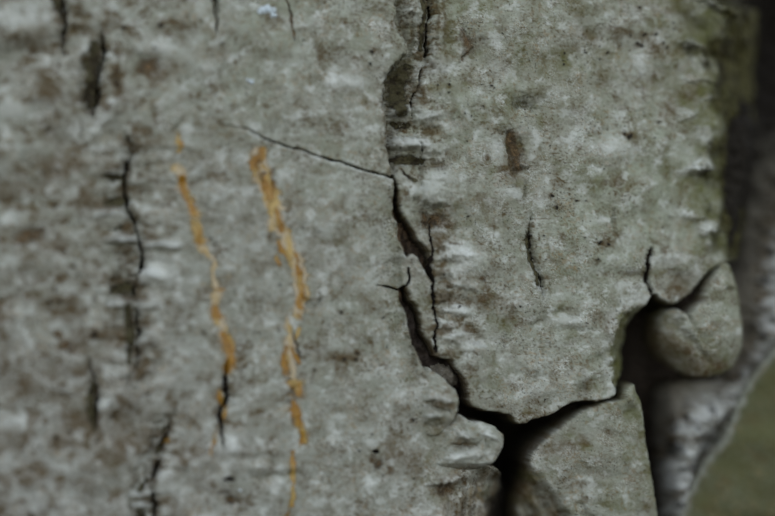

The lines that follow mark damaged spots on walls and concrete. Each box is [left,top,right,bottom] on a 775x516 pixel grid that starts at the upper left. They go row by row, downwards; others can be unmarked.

crack [102,140,144,365]
crack [216,374,229,448]
crack [376,209,579,476]
crack [617,248,717,507]